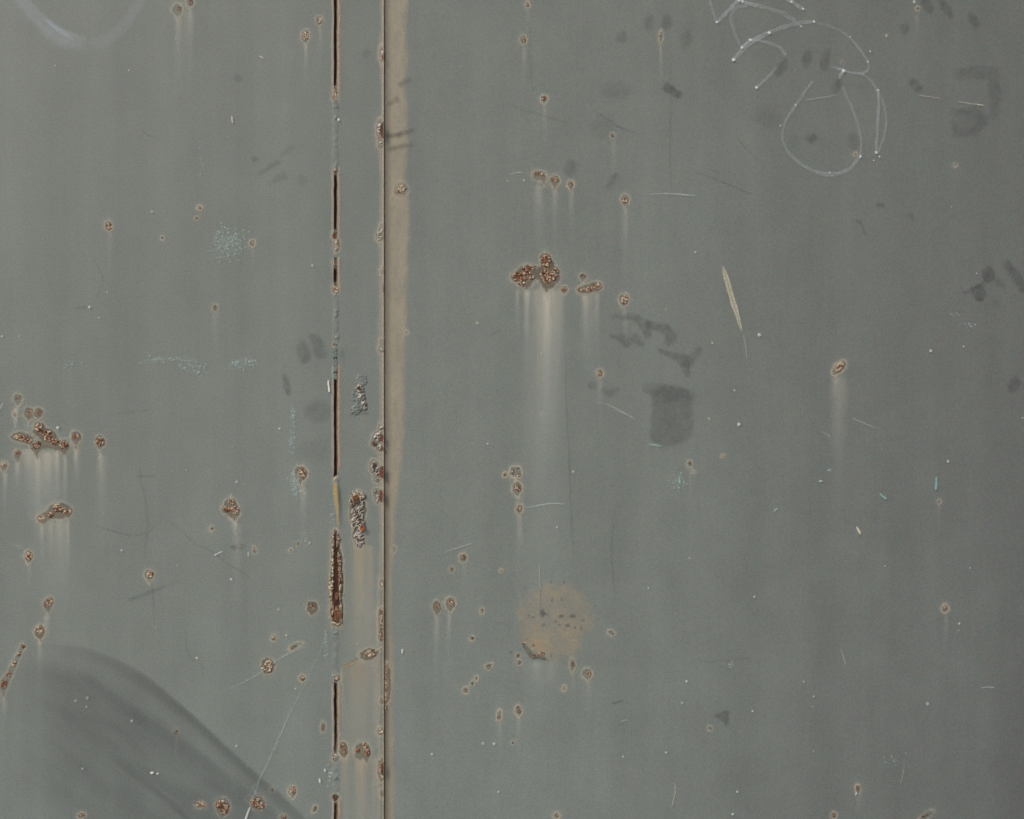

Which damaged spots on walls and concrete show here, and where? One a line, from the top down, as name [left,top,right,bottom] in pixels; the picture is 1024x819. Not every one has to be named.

rust [511,253,602,332]
rust [0,395,80,471]
rust [344,0,408,819]
rust [37,503,72,523]
rust [222,498,240,524]
rust [307,454,344,626]
rust [322,713,370,776]